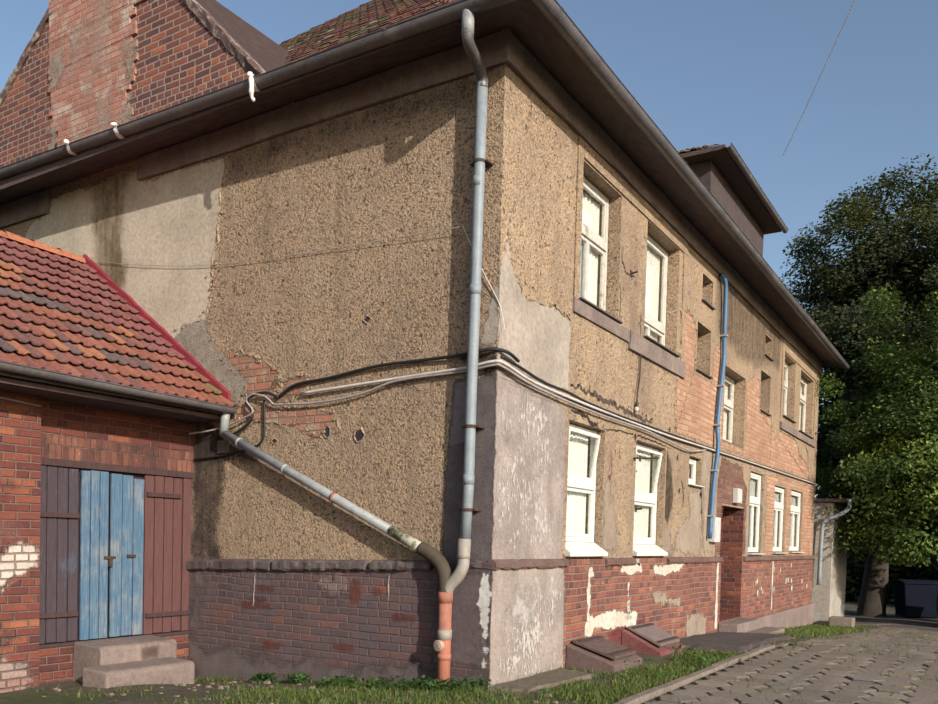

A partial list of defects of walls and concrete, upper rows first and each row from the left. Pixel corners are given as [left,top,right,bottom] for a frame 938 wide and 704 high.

damp [94,176,125,285]
spalling [174,310,341,445]
spalling [570,383,654,423]
peeling [498,402,560,553]
spalling [652,308,814,637]
peeling [476,573,562,683]
peeling [585,559,642,637]